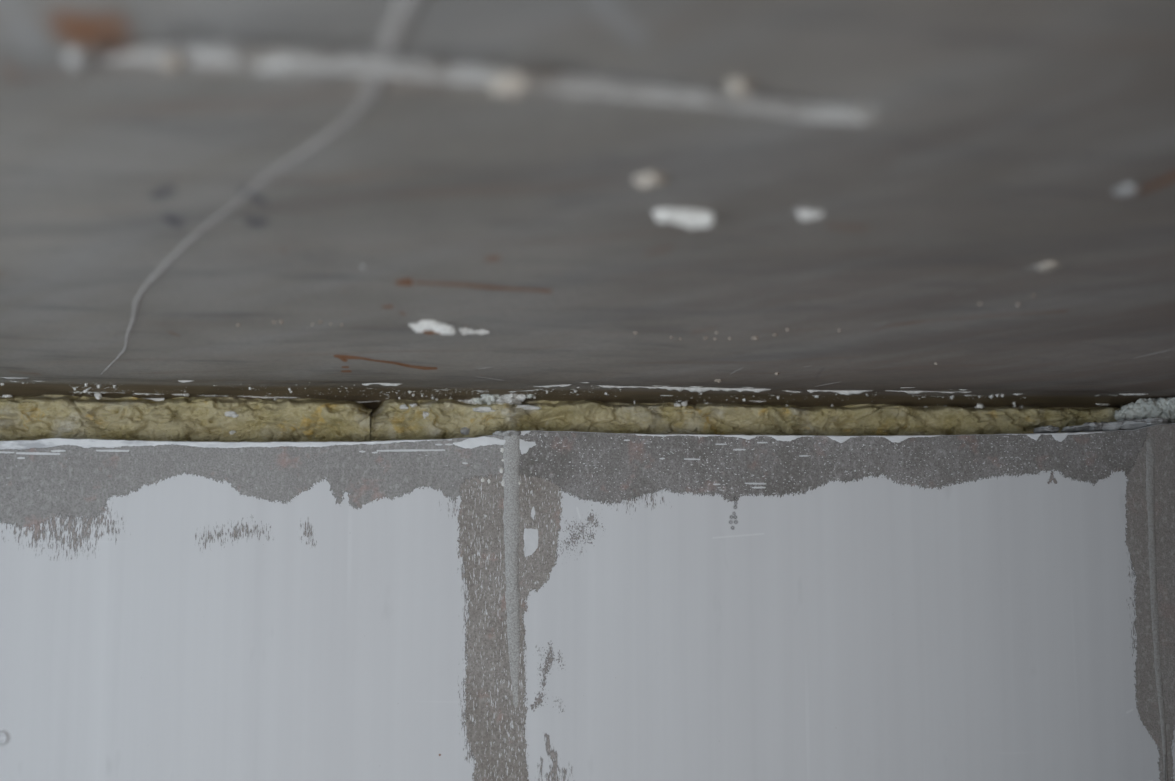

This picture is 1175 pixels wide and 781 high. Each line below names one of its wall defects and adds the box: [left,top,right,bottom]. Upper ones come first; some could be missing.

rust [392,274,556,295]
rust [332,353,439,374]
water stain [0,450,66,459]
water stain [359,443,453,454]